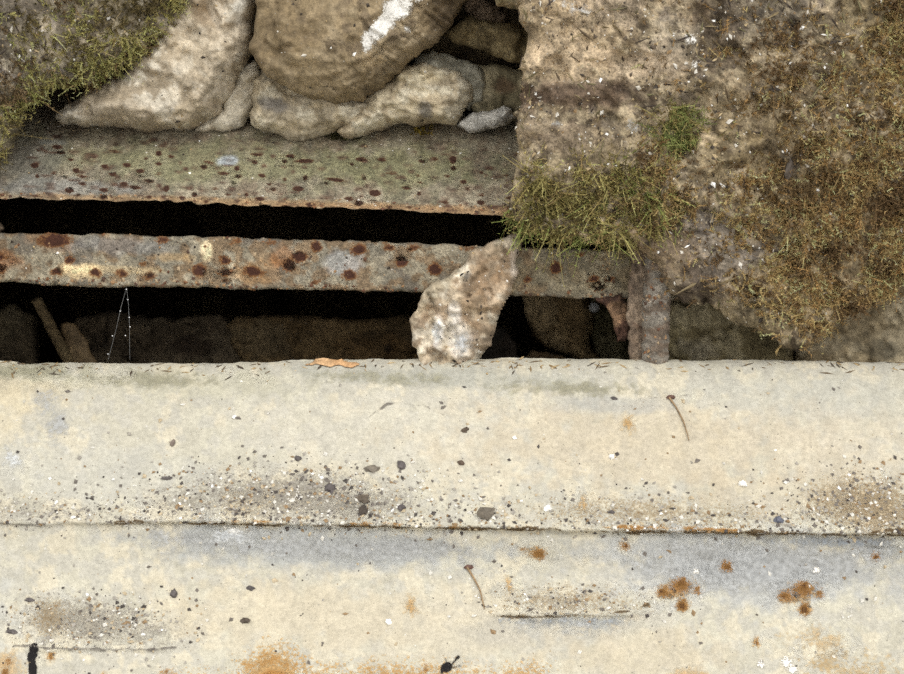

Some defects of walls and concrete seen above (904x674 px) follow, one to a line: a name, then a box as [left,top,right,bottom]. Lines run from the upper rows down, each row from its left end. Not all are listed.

corrosion [51,145,276,206]
corrosion [277,174,512,215]
corrosion [0,232,267,291]
corrosion [283,240,322,272]
corrosion [334,242,477,293]
corrosion [550,261,566,275]
corrosion [585,263,679,362]
corrosion [655,576,700,612]
corrosion [778,581,823,616]
corrosion [219,635,556,674]